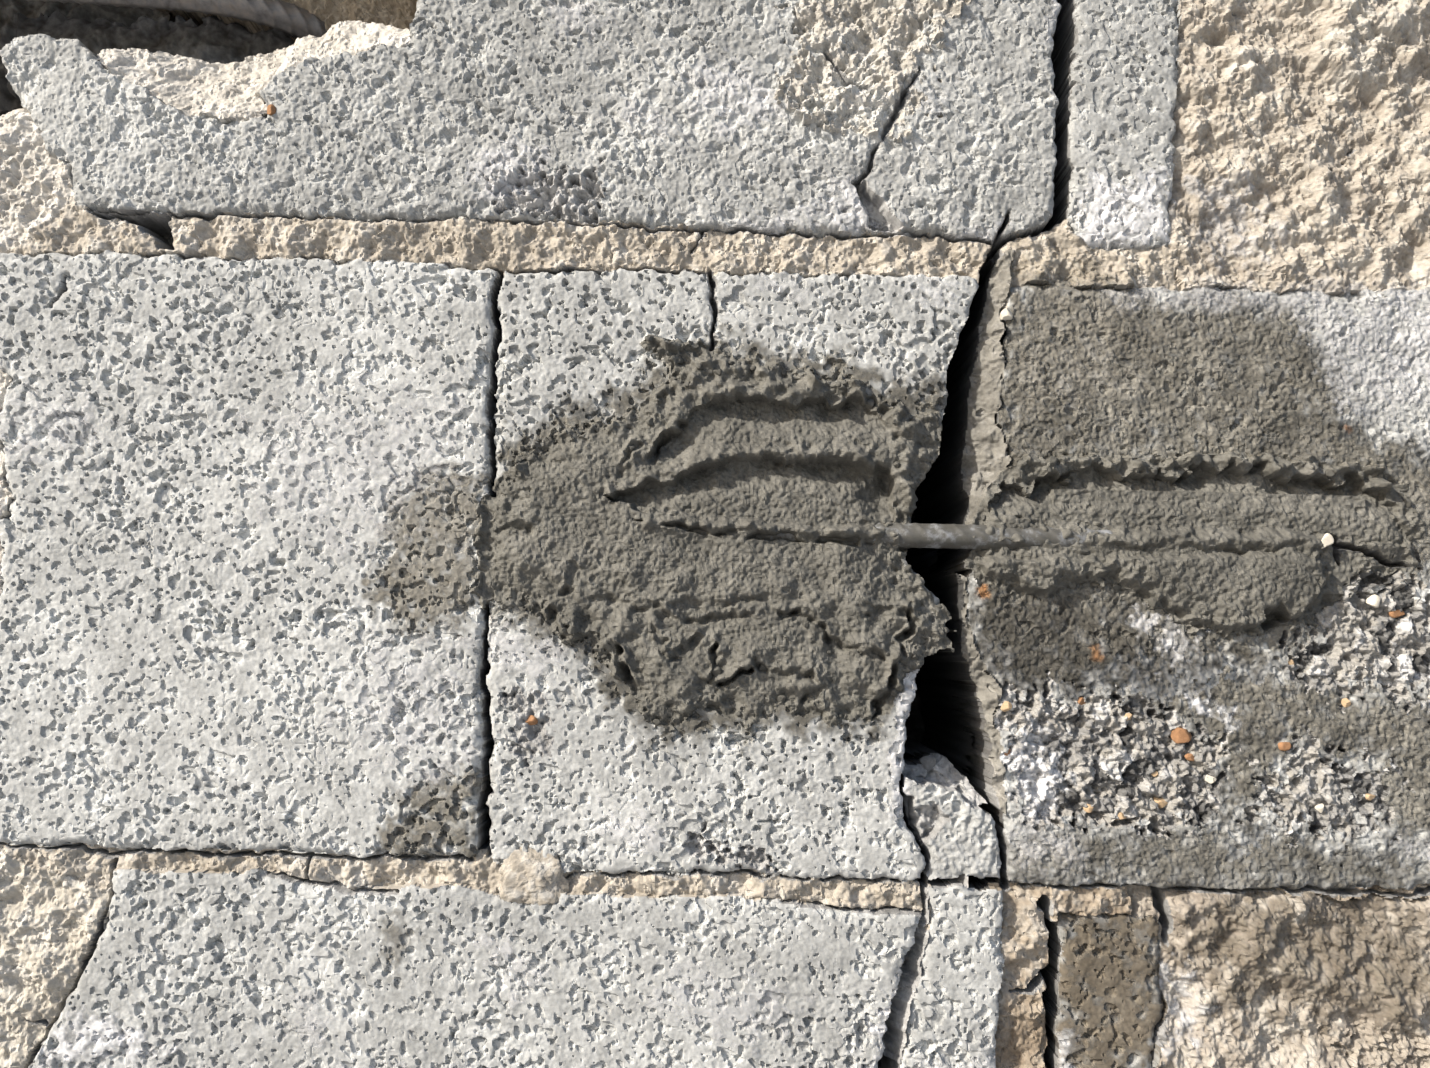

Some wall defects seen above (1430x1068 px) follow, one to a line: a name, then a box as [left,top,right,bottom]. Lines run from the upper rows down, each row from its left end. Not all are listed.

crack [86,0,1079,525]
leakage [362,351,920,817]
leakage [702,326,946,434]
leakage [996,153,1430,585]
crack [1329,533,1411,570]
leakage [380,762,491,858]
leakage [597,809,663,849]
crack [565,548,1430,1068]
leakage [969,574,1430,1068]